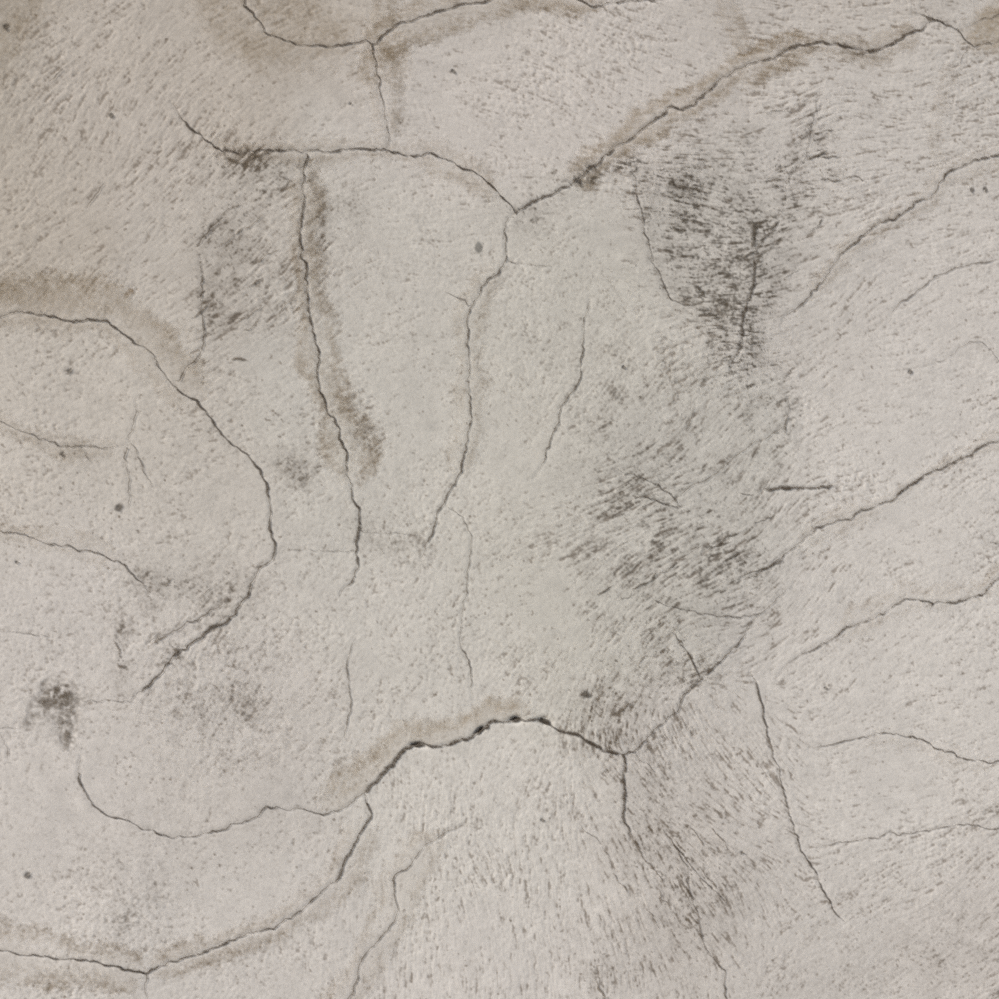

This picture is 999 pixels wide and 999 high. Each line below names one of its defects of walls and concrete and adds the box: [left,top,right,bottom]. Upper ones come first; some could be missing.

crack [0,277,276,702]
crack [0,601,775,999]
crack [183,0,999,586]
crack [756,683,839,917]
crack [795,578,998,659]